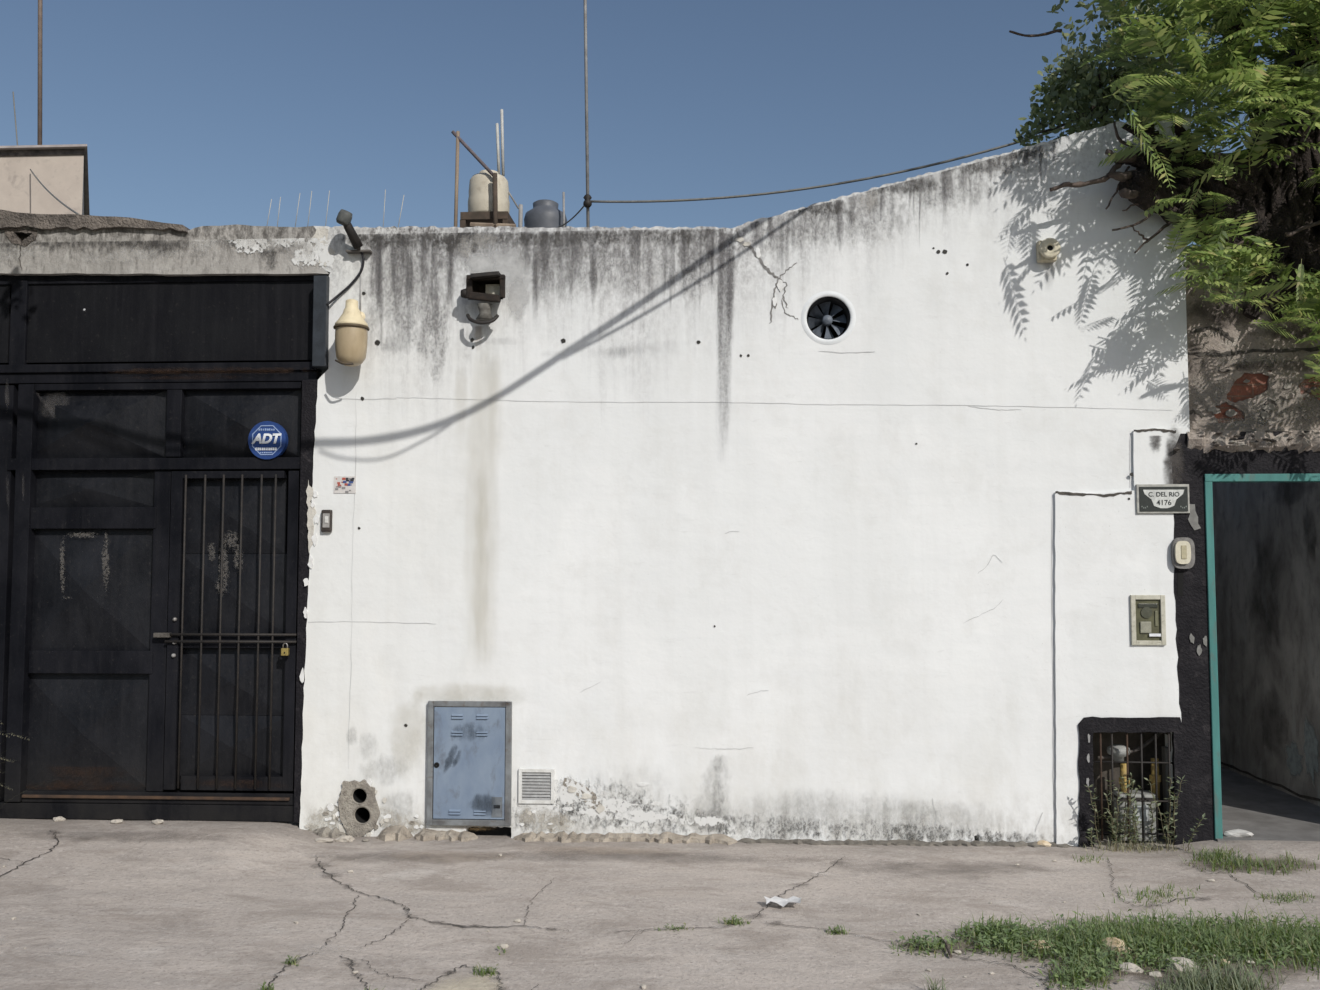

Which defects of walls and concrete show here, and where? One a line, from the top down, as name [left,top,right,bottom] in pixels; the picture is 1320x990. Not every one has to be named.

leakage [1007,147,1042,170]
leakage [794,202,841,219]
leakage [359,230,610,306]
leakage [634,229,733,331]
crack [735,228,798,324]
flaking render [1214,369,1320,423]